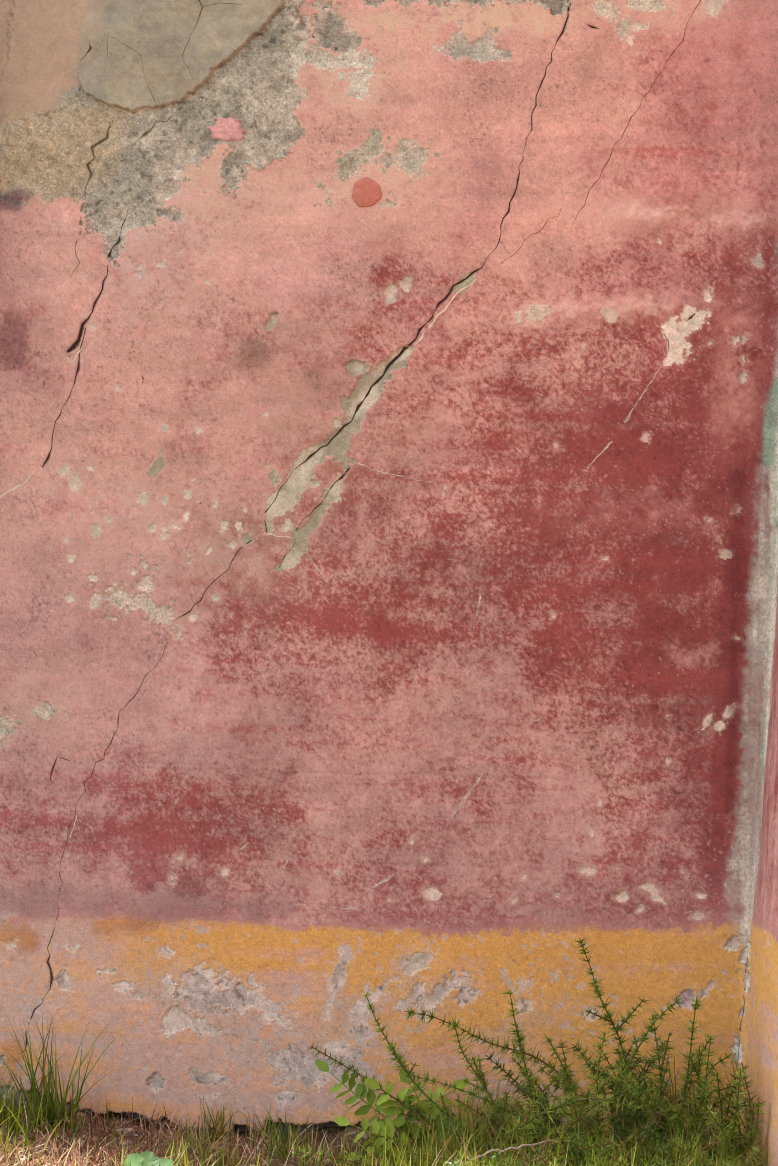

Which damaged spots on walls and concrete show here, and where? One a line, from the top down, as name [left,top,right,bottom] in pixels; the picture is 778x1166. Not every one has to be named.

spalling [363,0,578,63]
spalling [592,0,676,47]
spalling [0,0,383,278]
spalling [314,121,440,208]
peeling [384,276,414,305]
peeling [661,287,714,367]
spalling [263,346,415,573]
peeling [212,501,253,550]
crack [18,0,701,1055]
spalling [87,555,198,641]
water stain [724,360,778,945]
peeling [159,946,480,1109]